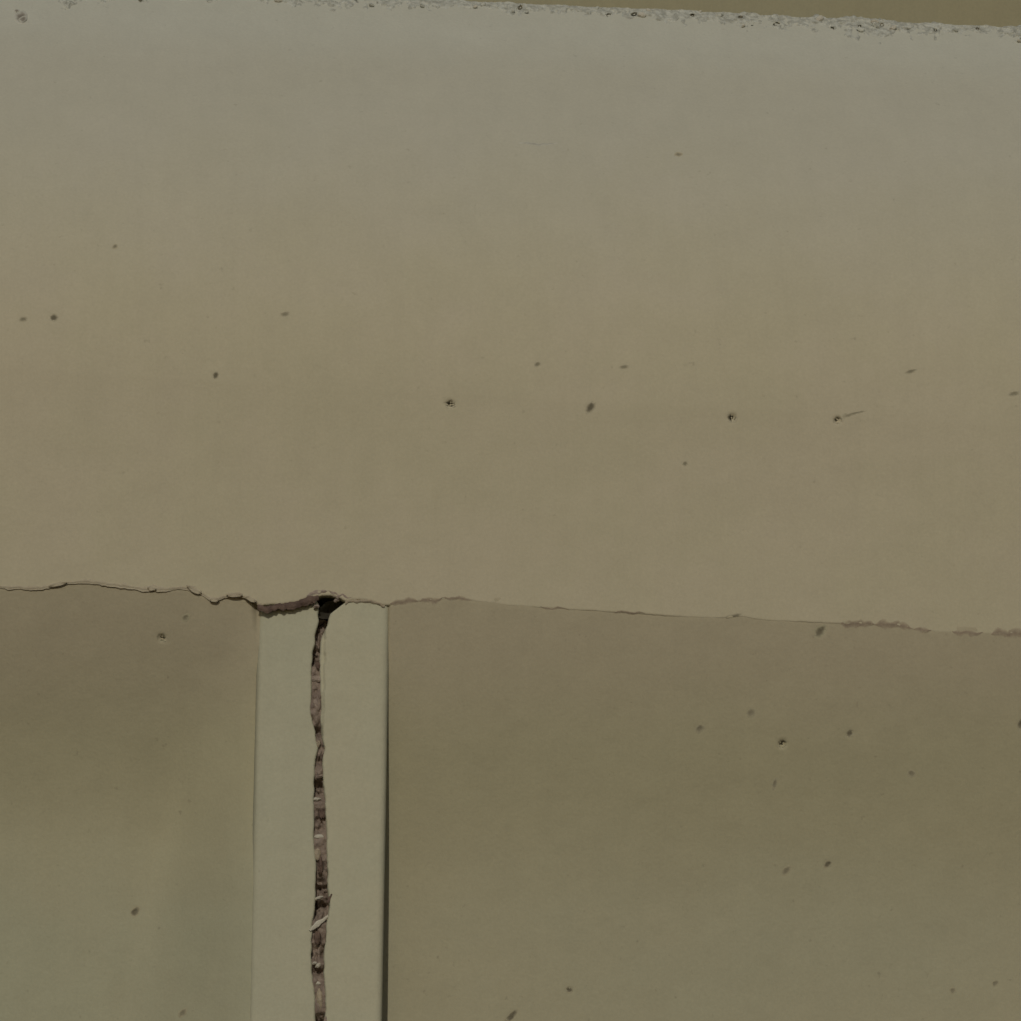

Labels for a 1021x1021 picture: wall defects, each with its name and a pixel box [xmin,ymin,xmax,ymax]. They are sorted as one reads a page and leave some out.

spalling [257,0,1021,45]
peeling [841,619,931,634]
crack [309,600,332,1021]